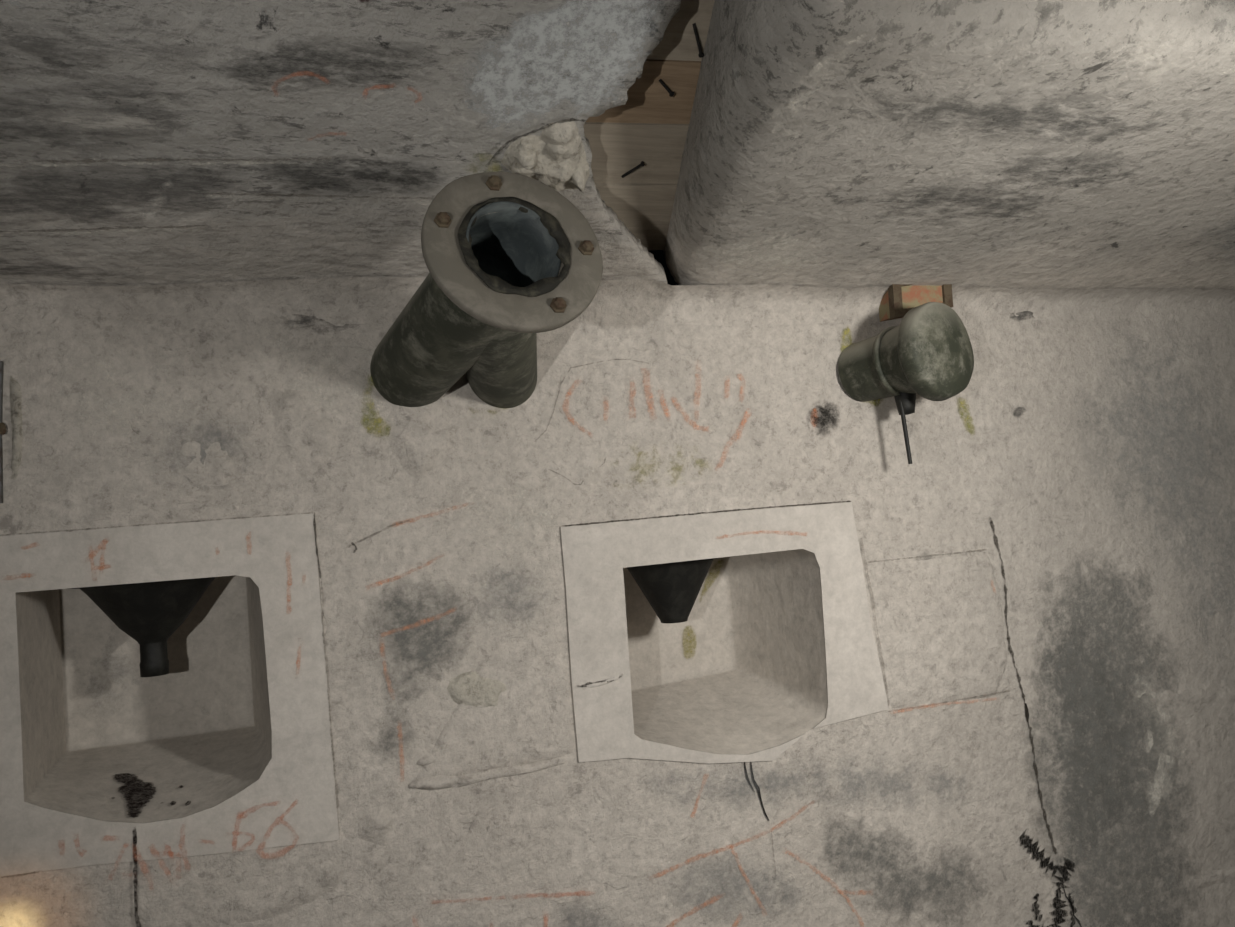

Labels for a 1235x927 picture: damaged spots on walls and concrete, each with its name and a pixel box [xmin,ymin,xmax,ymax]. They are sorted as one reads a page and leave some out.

spalling [501,121,589,191]
damp [384,596,465,681]
crack [990,520,1057,854]
damp [1020,571,1184,927]